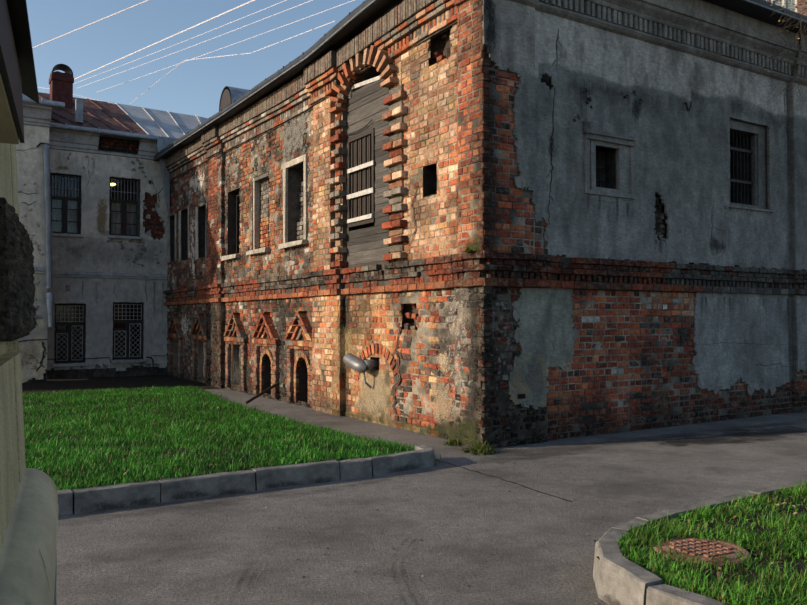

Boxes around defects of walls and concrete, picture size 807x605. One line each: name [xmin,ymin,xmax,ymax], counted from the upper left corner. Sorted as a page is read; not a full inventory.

crack [546,28,563,227]
flaking render [654,192,667,241]